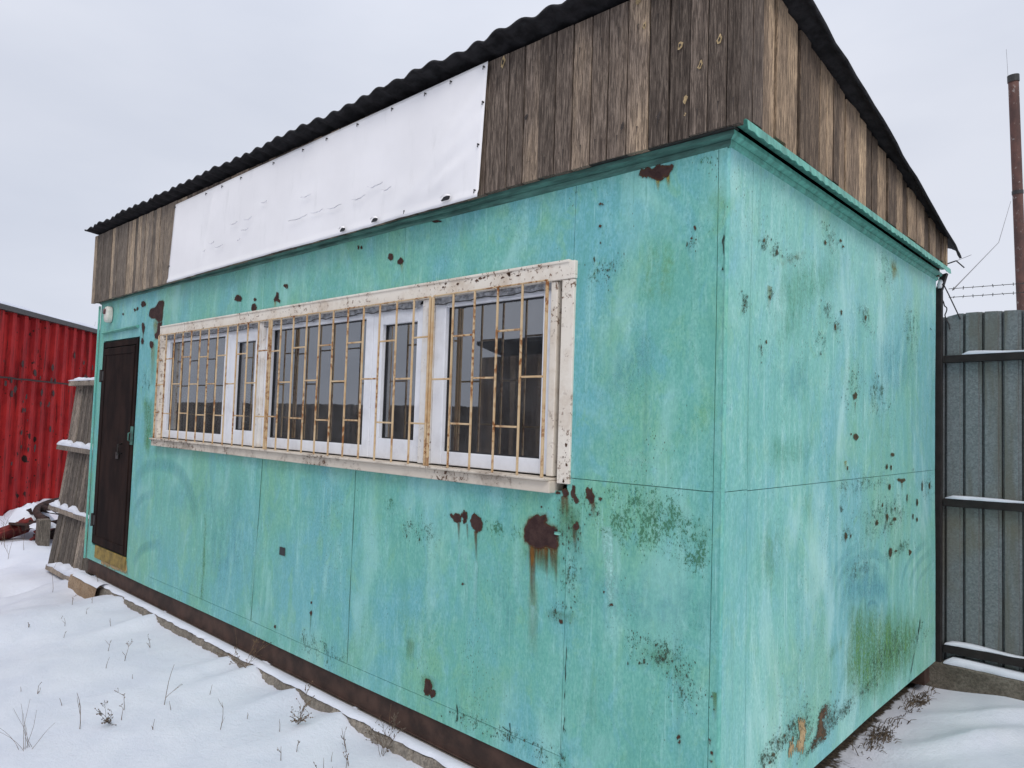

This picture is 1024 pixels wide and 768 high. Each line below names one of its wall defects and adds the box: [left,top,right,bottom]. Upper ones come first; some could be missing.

rust [639,164,674,184]
rust [122,300,164,349]
rust [555,485,602,506]
rust [886,453,931,521]
rust [449,510,483,542]
rust [524,506,559,581]
rust [424,678,436,698]